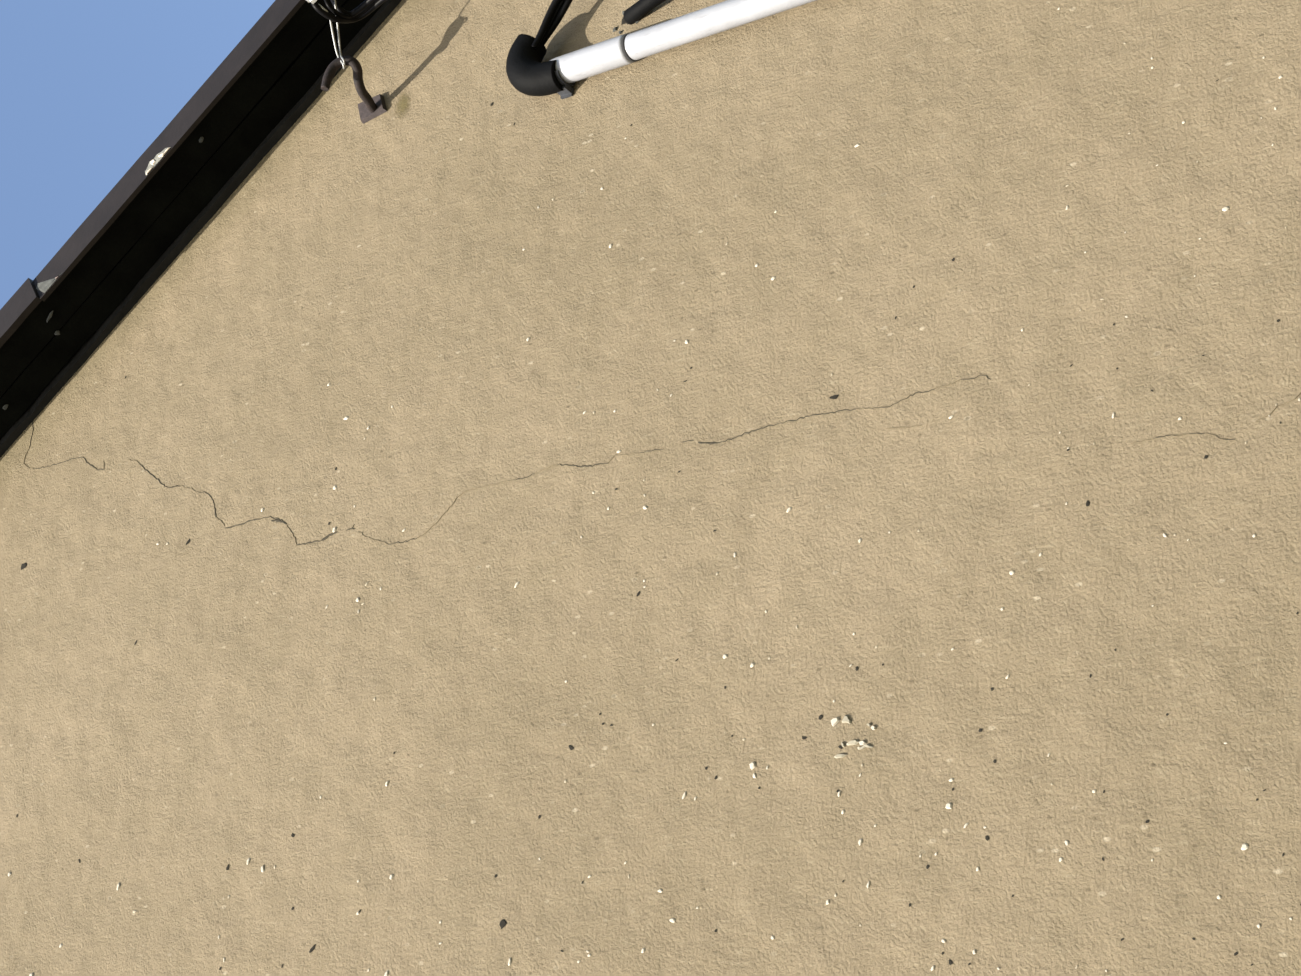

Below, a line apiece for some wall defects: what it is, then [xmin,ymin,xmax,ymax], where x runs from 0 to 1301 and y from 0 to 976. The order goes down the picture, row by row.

crack [24,375,989,545]